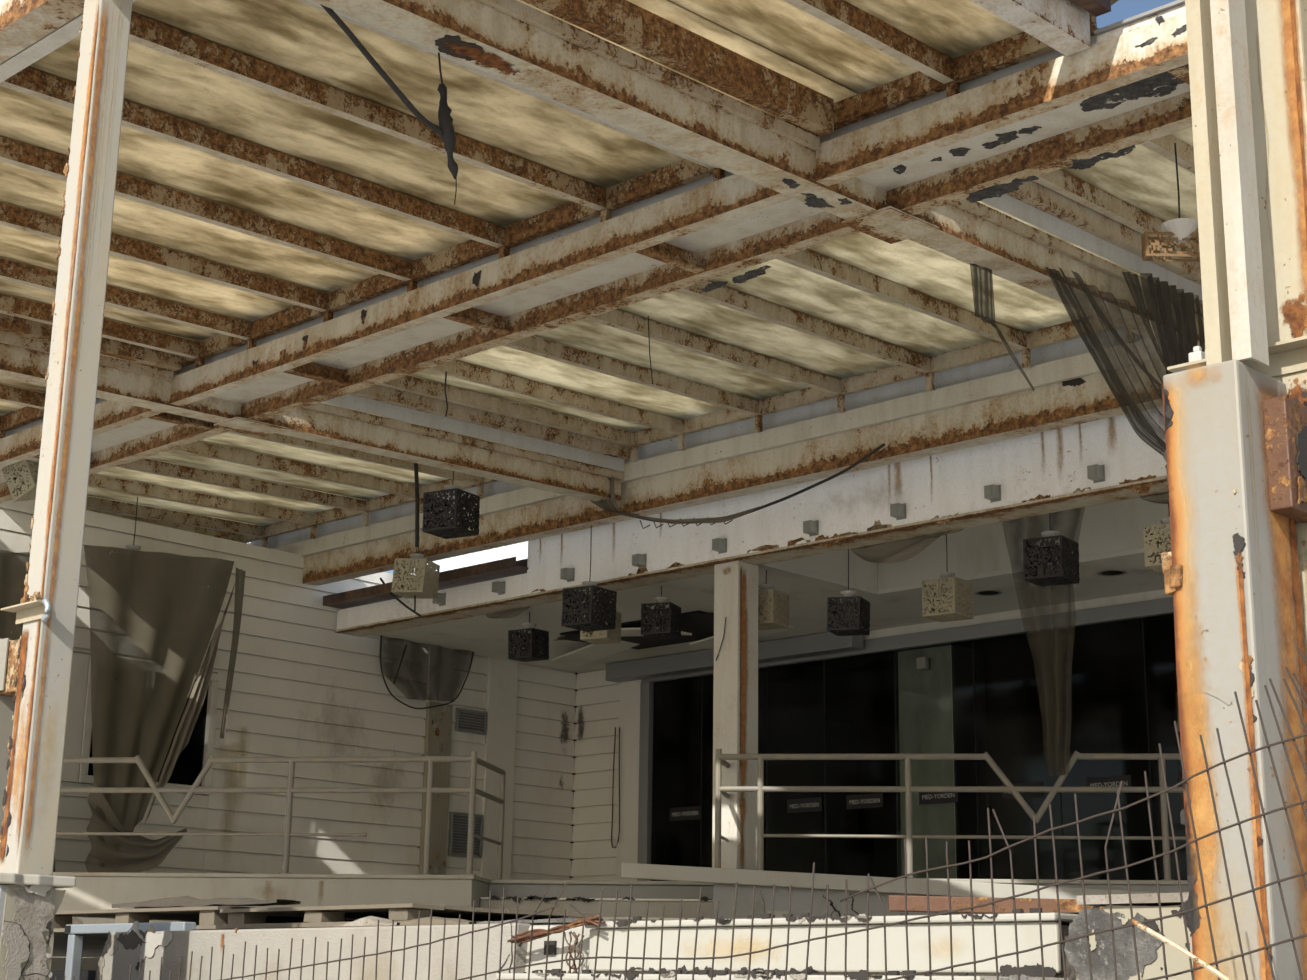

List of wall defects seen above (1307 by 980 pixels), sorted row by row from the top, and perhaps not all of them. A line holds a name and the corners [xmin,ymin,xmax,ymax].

rust [435,35,520,75]
peeling [1080,71,1185,112]
peeling [782,178,852,208]
rust [1280,0,1307,338]
rust [1062,378,1086,387]
rust [0,11,107,860]
rust [1261,380,1307,980]
rust [1232,533,1272,980]
spalling [1,874,55,980]
spalling [95,921,173,980]
spalling [591,965,819,980]
spalling [999,905,1162,980]